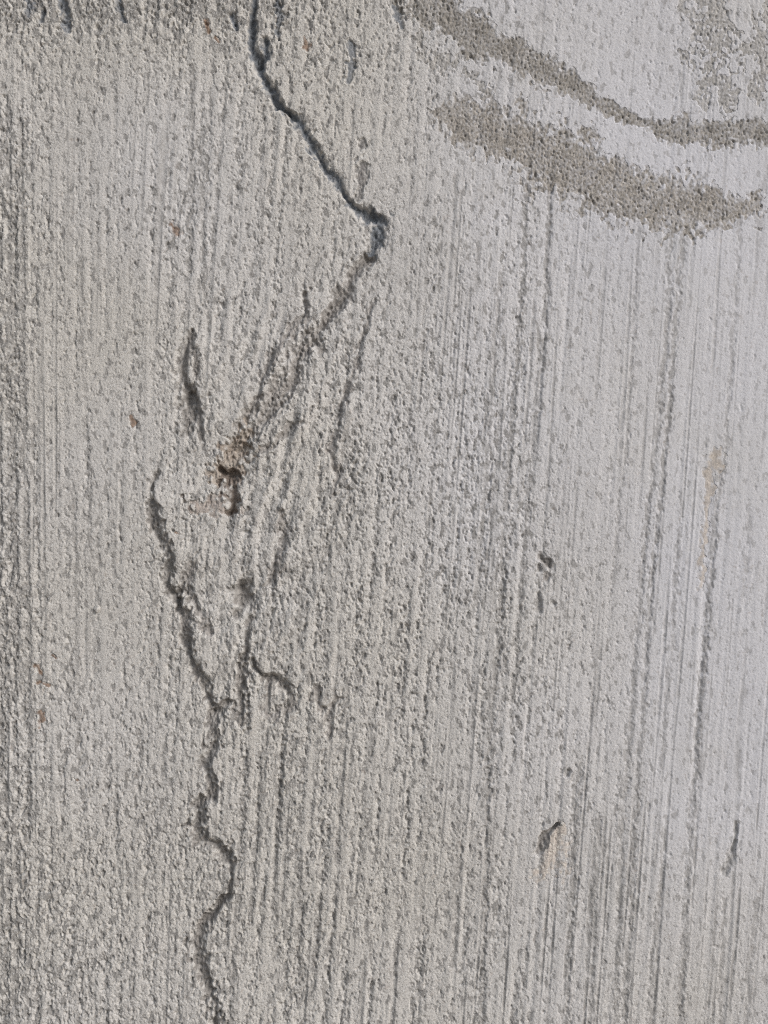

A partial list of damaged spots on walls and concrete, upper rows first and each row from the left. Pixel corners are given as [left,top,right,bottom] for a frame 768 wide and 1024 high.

crack [170,328,212,449]
crack [232,0,396,498]
crack [145,466,346,1024]